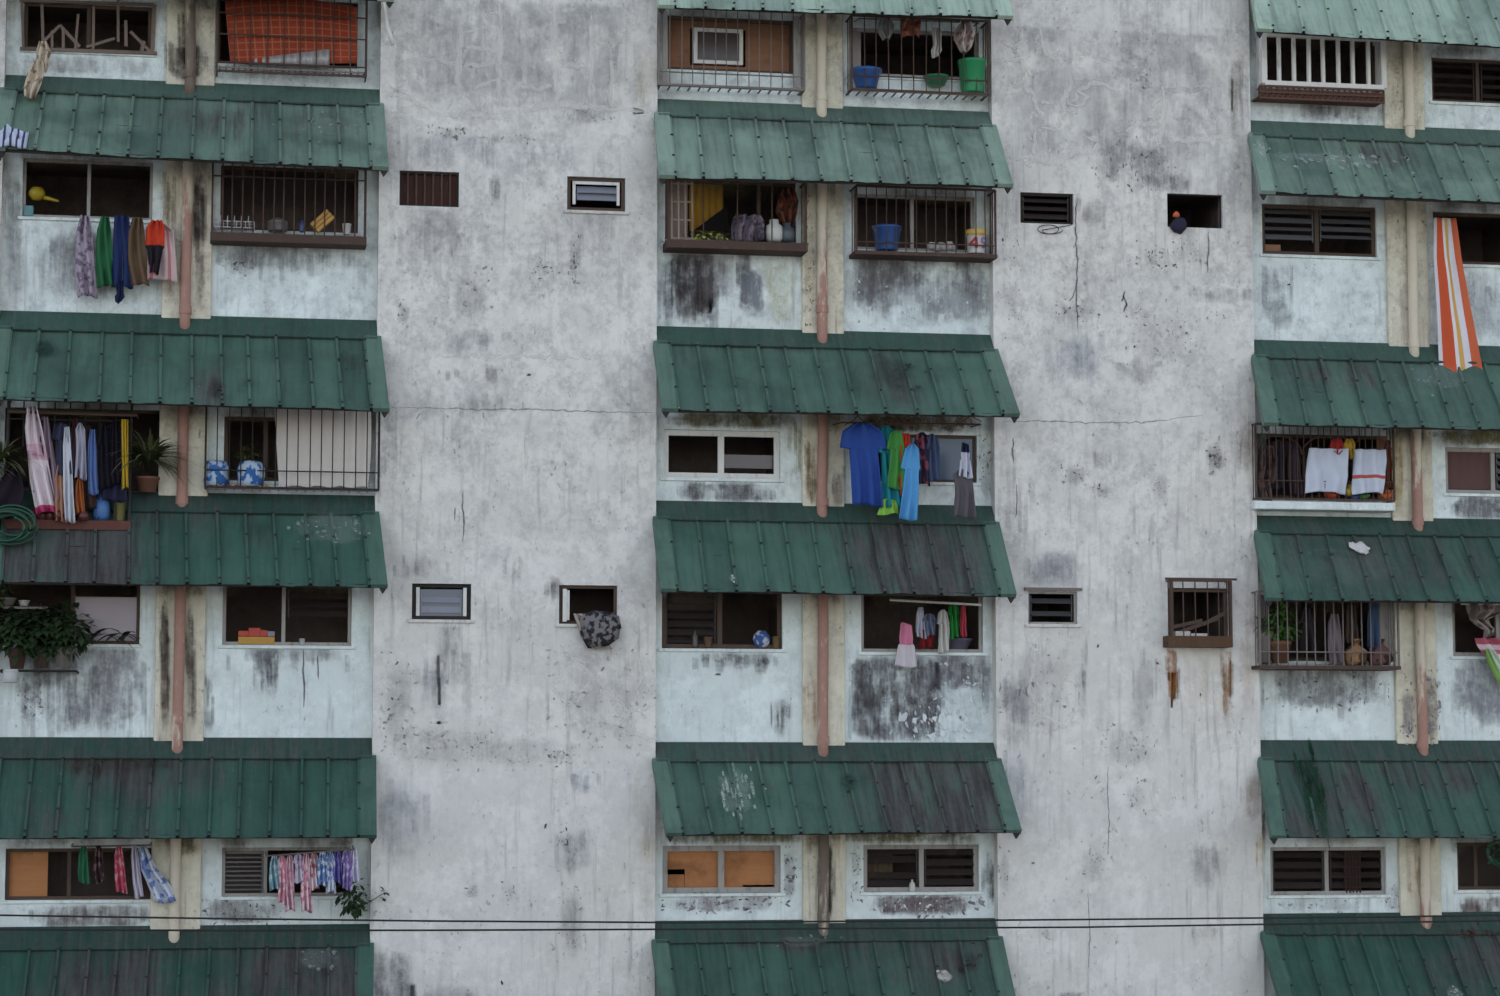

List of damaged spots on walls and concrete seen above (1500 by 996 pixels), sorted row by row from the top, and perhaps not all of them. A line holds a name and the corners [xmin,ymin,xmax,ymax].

water stain [671,253,724,320]
water stain [740,255,762,310]
water stain [858,259,923,307]
crack [1070,204,1079,335]
water stain [29,649,134,721]
water stain [161,613,194,717]
water stain [849,656,985,739]